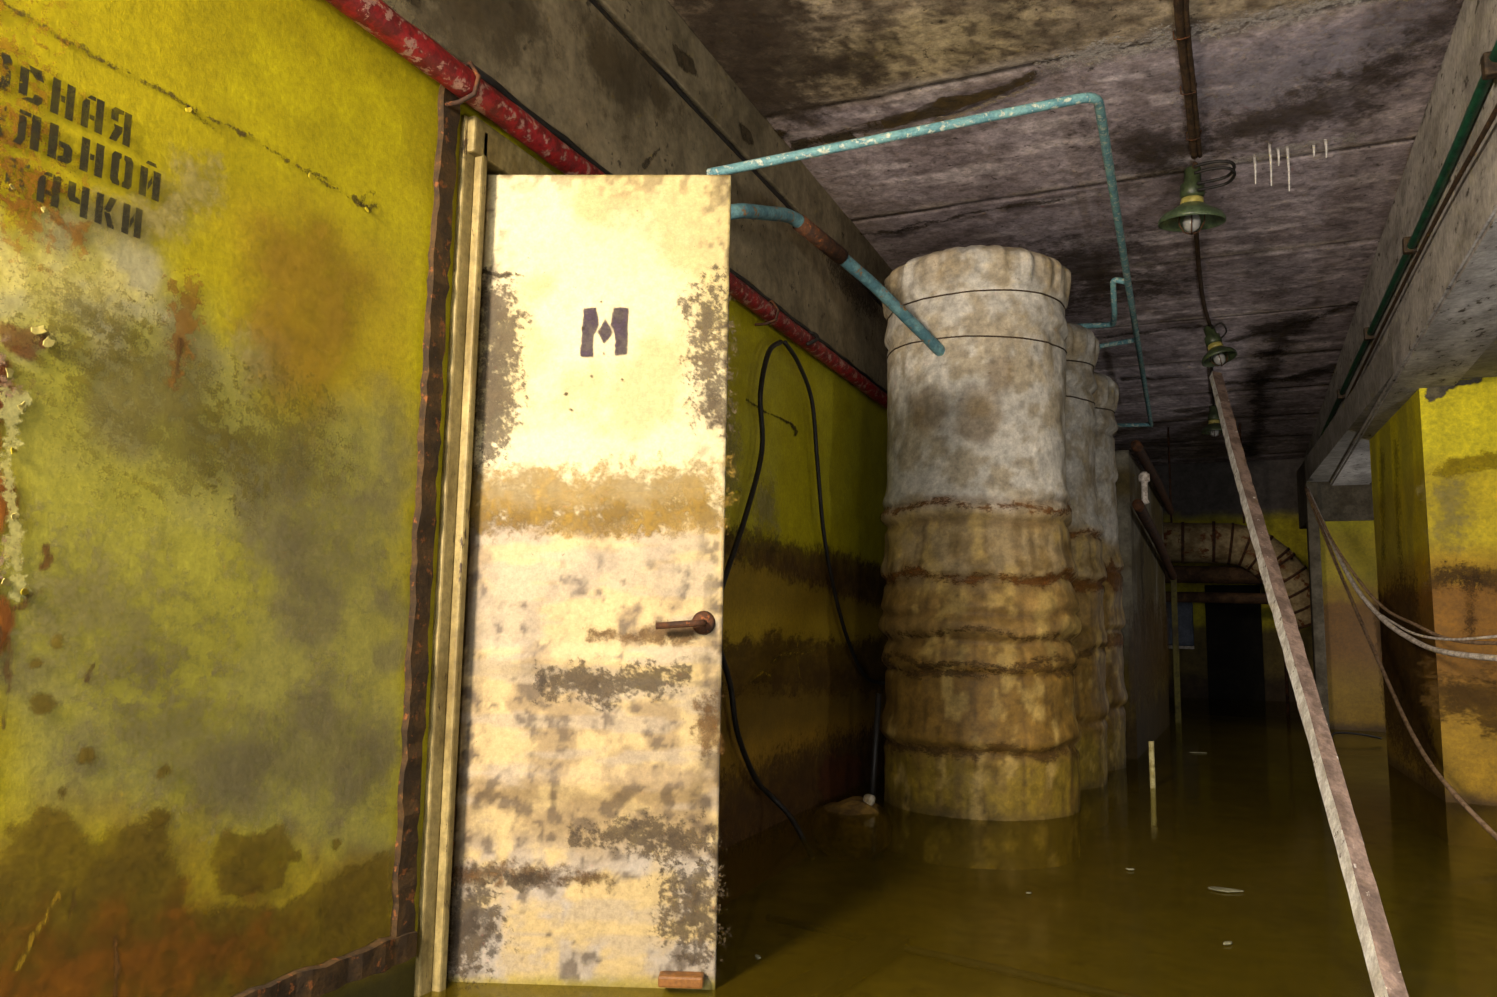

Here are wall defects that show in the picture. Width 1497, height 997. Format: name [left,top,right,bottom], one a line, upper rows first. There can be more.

peeling [0,102,91,262]
crack [0,0,377,213]
damp [668,0,897,138]
damp [1018,224,1197,316]
damp [1035,0,1462,178]
peeling [0,322,55,650]
damp [1432,451,1497,478]
damp [533,659,692,712]
damp [1372,559,1497,785]
damp [0,787,392,997]
mould [446,862,507,990]
damp [567,726,885,977]